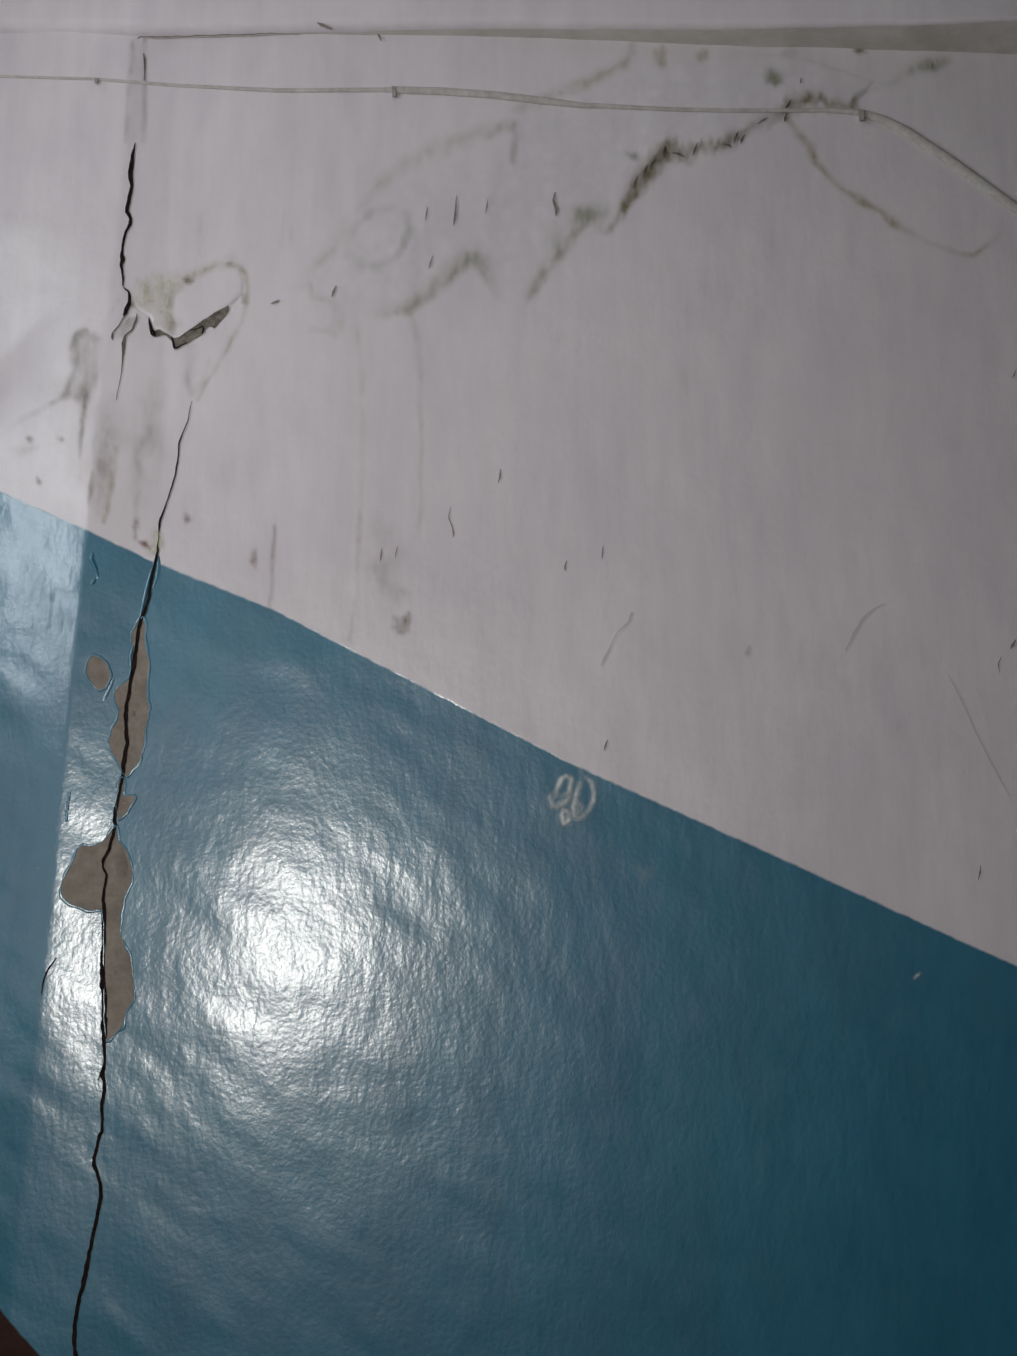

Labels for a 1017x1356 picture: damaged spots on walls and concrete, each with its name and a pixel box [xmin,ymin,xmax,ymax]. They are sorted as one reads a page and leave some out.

crack [111,143,137,400]
flaking render [148,305,229,349]
damp [621,142,698,212]
crack [41,958,56,995]
peeling [59,616,152,1043]
crack [72,402,192,1356]